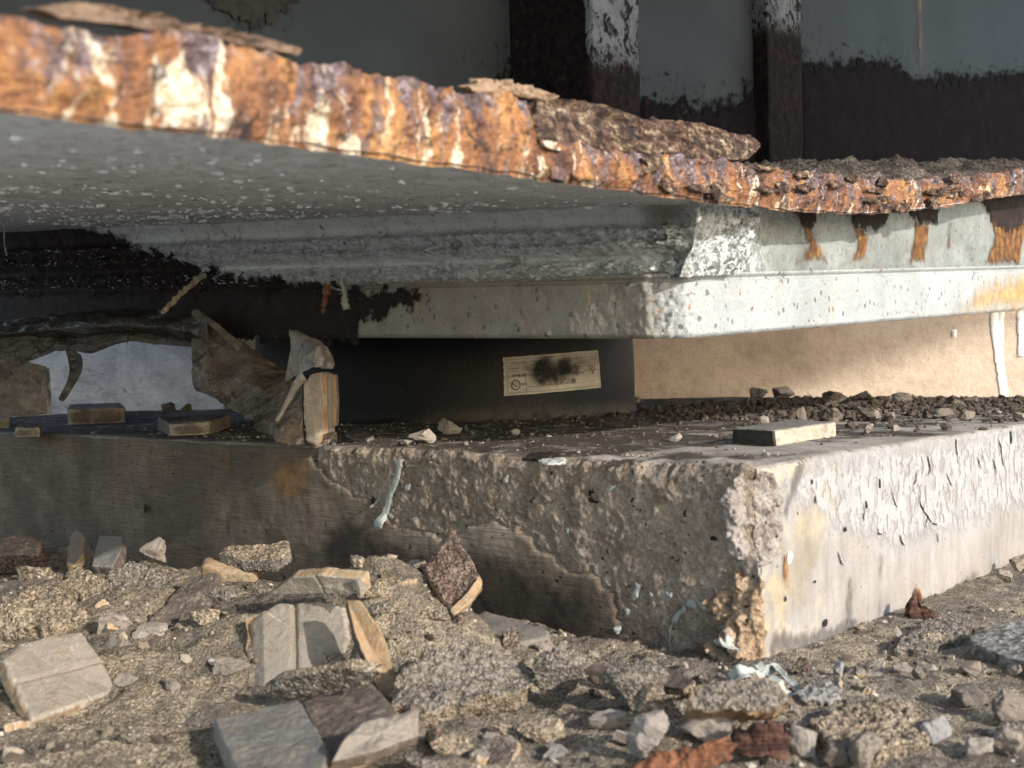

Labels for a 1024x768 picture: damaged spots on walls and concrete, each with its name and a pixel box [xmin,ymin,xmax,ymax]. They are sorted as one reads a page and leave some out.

rust [21,2,302,56]
rust [453,38,761,163]
rust [801,16,1024,162]
rust [796,211,825,263]
rust [853,213,896,260]
rust [910,207,951,264]
rust [981,194,1024,264]
spalling [317,429,1024,663]